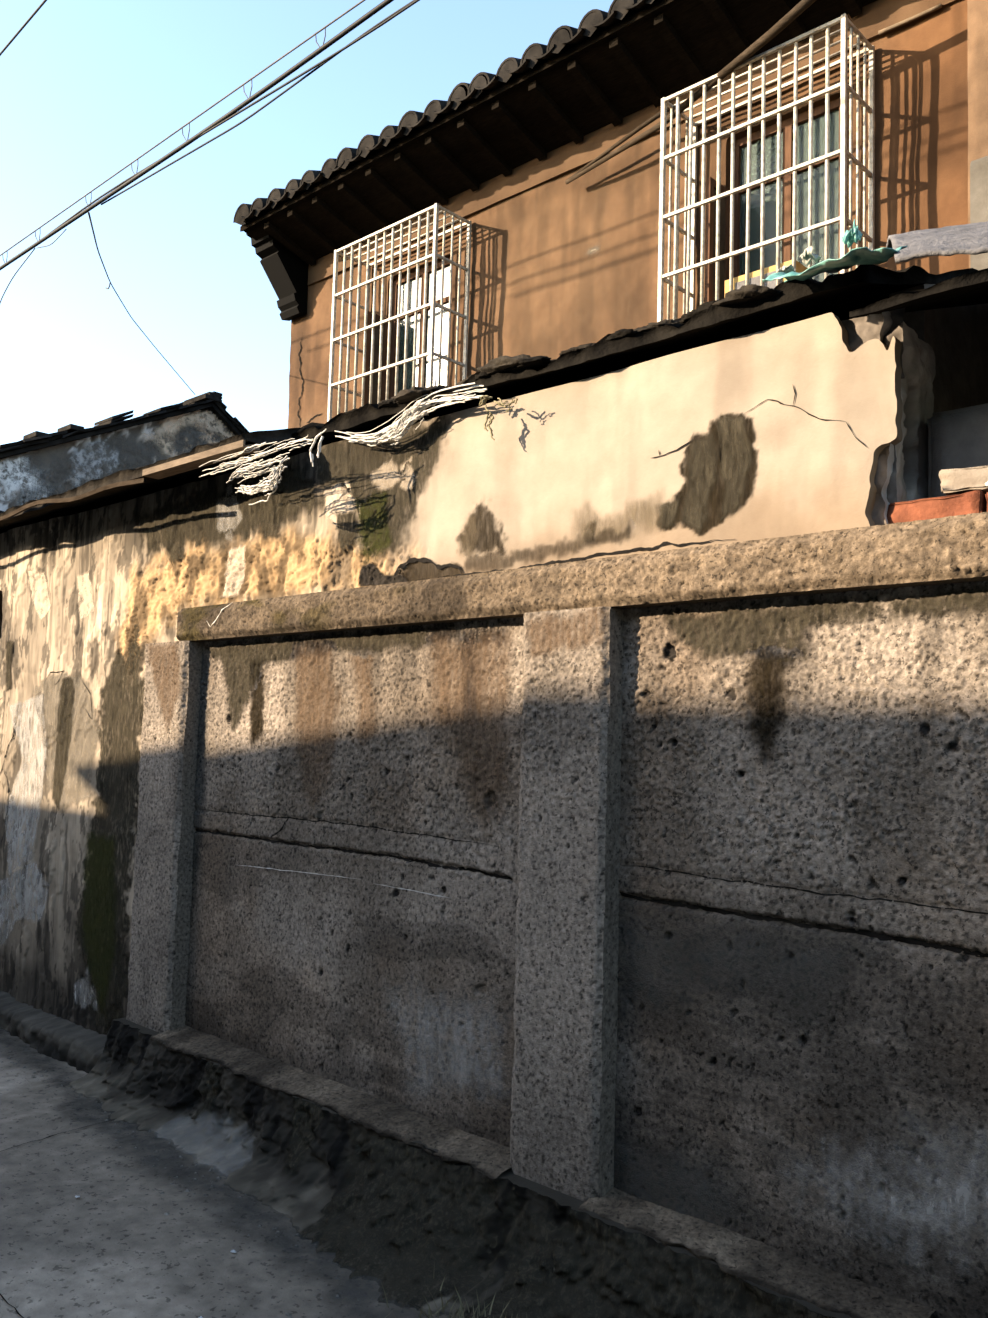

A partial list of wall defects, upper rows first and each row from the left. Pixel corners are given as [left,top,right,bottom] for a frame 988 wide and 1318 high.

spalling [841,308,905,379]
peeling [144,410,234,455]
crack [744,386,866,446]
peeling [0,457,53,503]
water stain [585,414,757,540]
spalling [871,444,897,525]
water stain [28,571,51,619]
water stain [78,573,94,617]
water stain [52,678,74,811]
water stain [190,623,482,913]
water stain [75,624,145,1035]